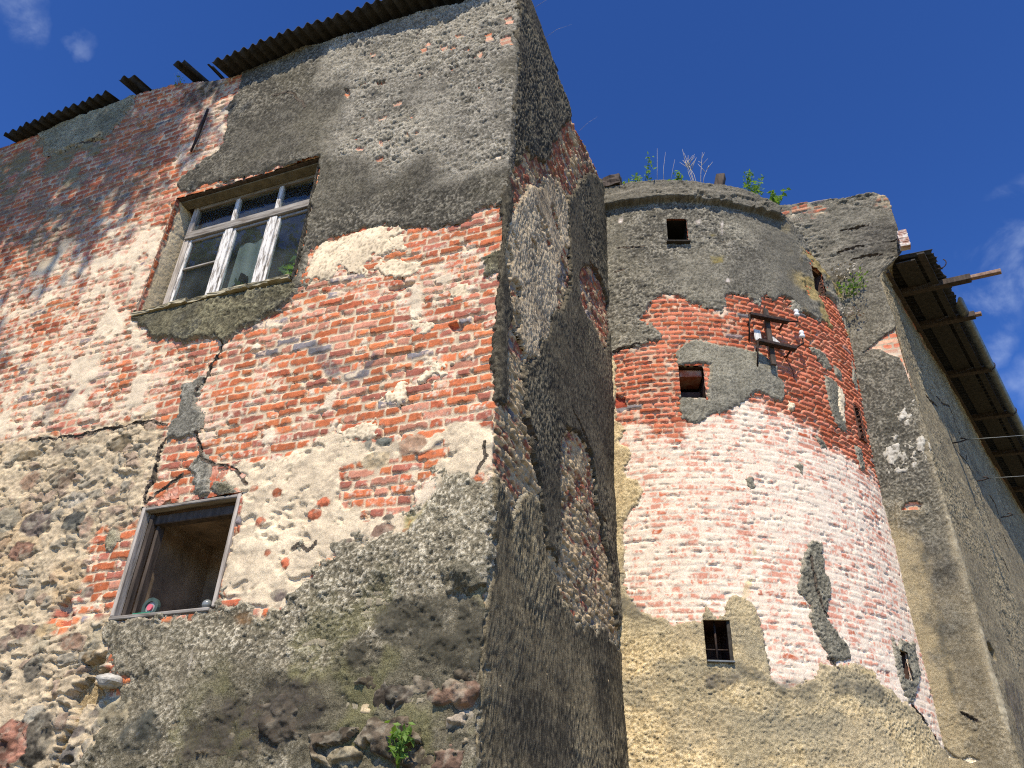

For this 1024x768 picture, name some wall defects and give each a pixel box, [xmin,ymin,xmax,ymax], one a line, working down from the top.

peeling [38,95,136,158]
peeling [131,0,572,345]
crack [194,339,223,392]
crack [28,419,248,504]
peeling [72,169,957,768]
spalling [53,730,73,768]